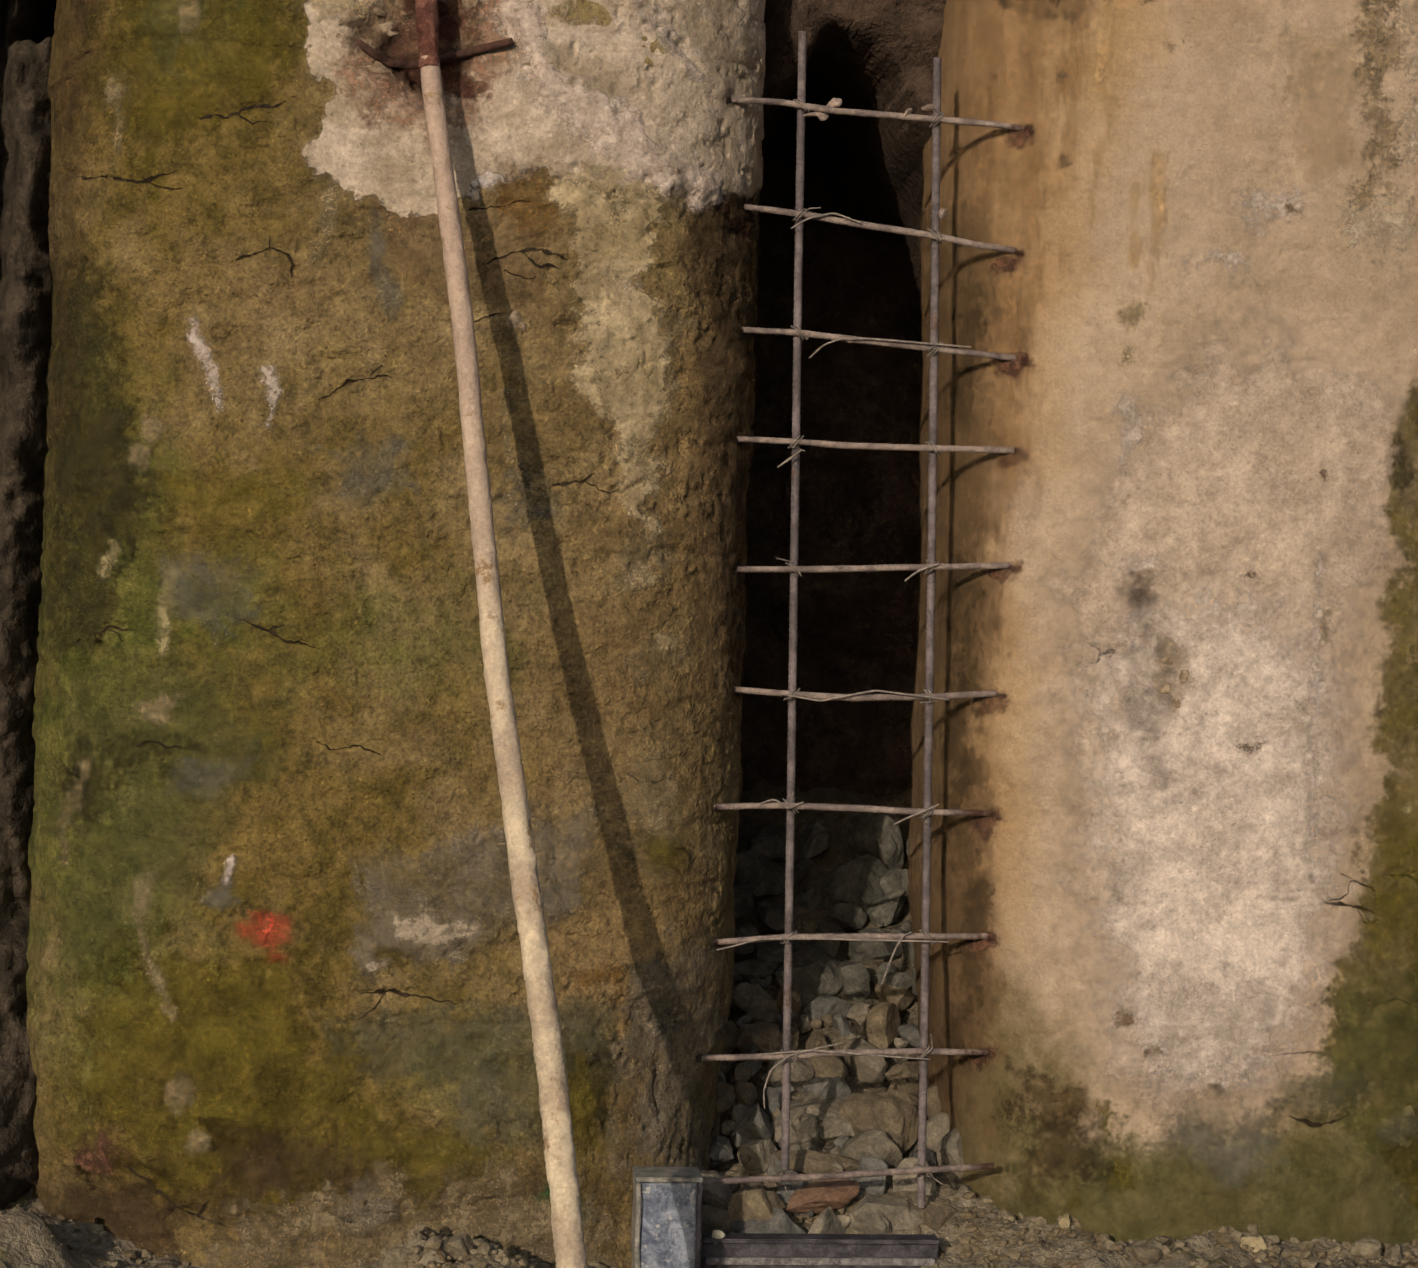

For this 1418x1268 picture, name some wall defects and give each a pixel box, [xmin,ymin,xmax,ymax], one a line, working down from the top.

spalling [356,39,419,69]
corrosion [415,0,440,72]
spalling [440,37,514,63]